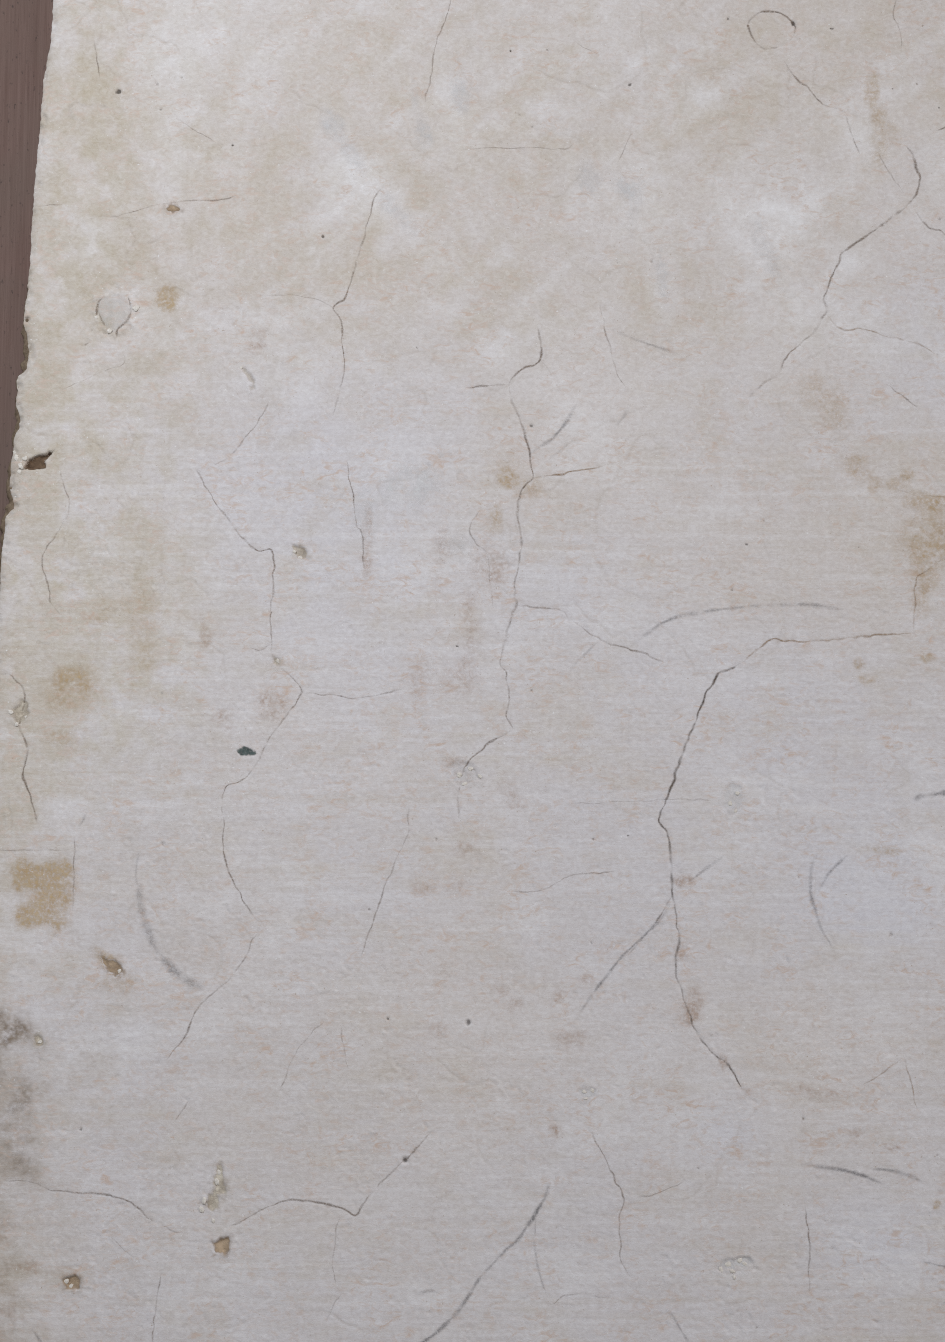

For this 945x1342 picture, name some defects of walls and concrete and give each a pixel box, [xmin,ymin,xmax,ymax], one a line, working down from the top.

damp [14,862,72,927]
spalling [199,1165,226,1223]
spalling [214,1237,230,1255]